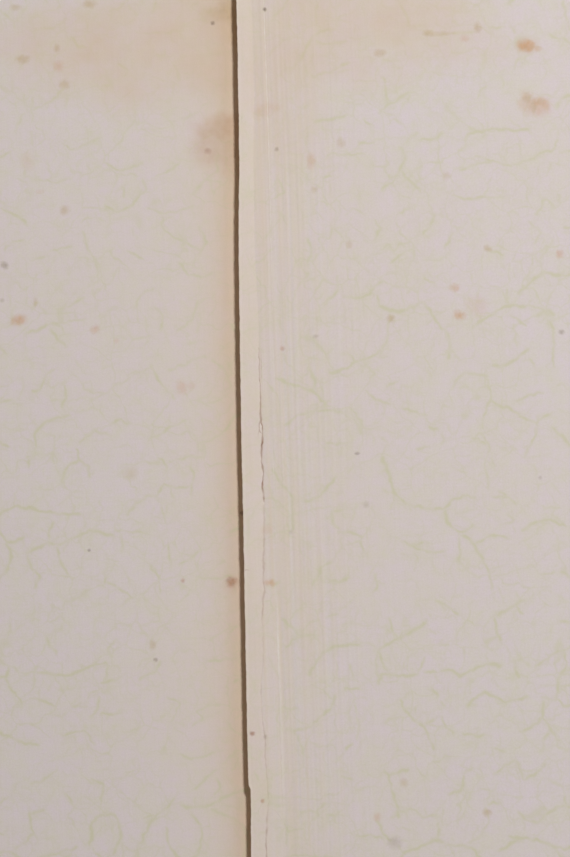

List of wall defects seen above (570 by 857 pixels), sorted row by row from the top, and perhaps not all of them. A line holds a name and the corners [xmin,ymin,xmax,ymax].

crack [257,348,285,857]